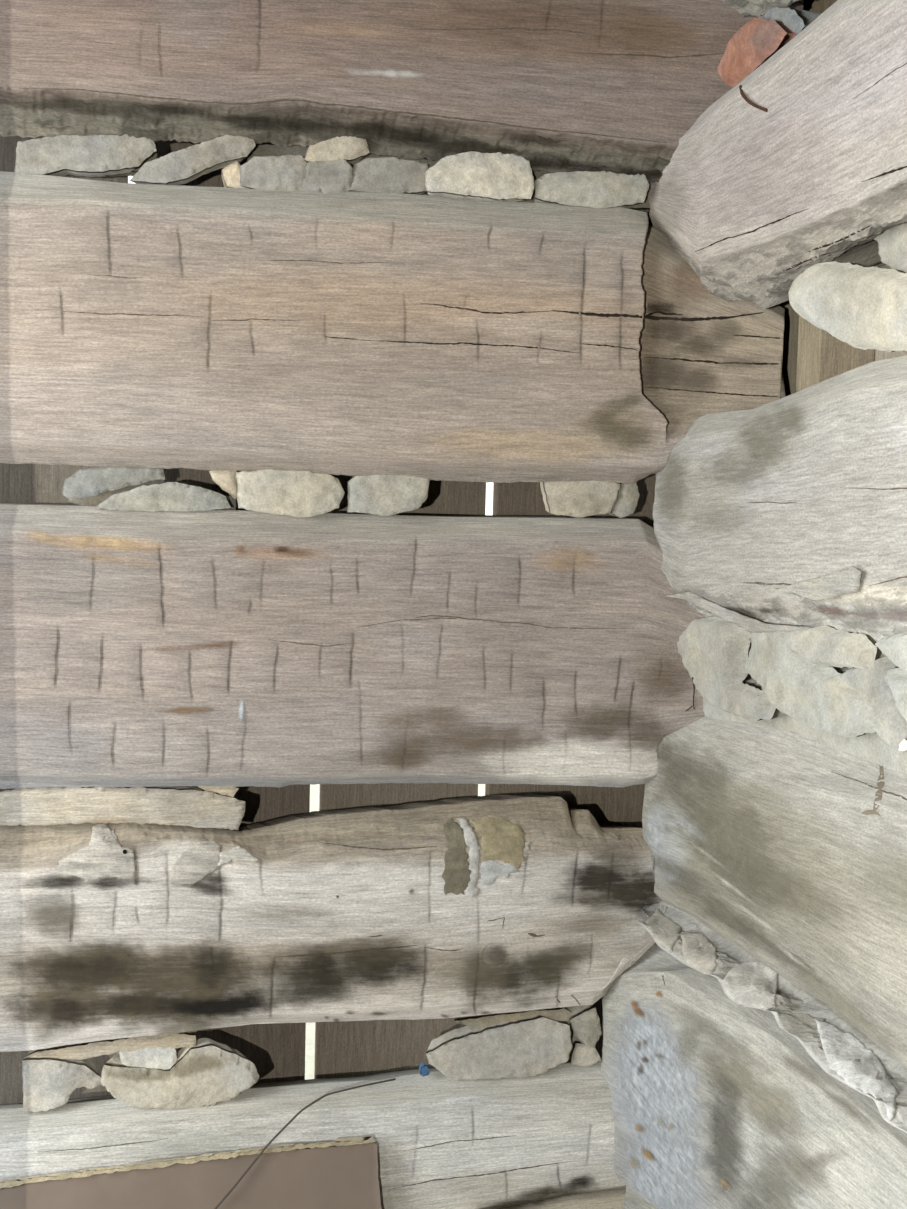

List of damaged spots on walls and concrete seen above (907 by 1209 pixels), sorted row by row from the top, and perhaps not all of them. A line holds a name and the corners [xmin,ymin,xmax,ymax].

crack [853,62,907,99]
crack [862,166,907,182]
crack [695,209,806,252]
crack [776,225,871,275]
crack [325,303,780,397]
crack [744,579,792,587]
corrosion [862,765,885,816]
peeling [442,816,531,897]
water stain [107,994,262,1034]
water stain [279,986,332,1003]
flaking render [636,900,907,1133]
water stain [708,1096,739,1184]